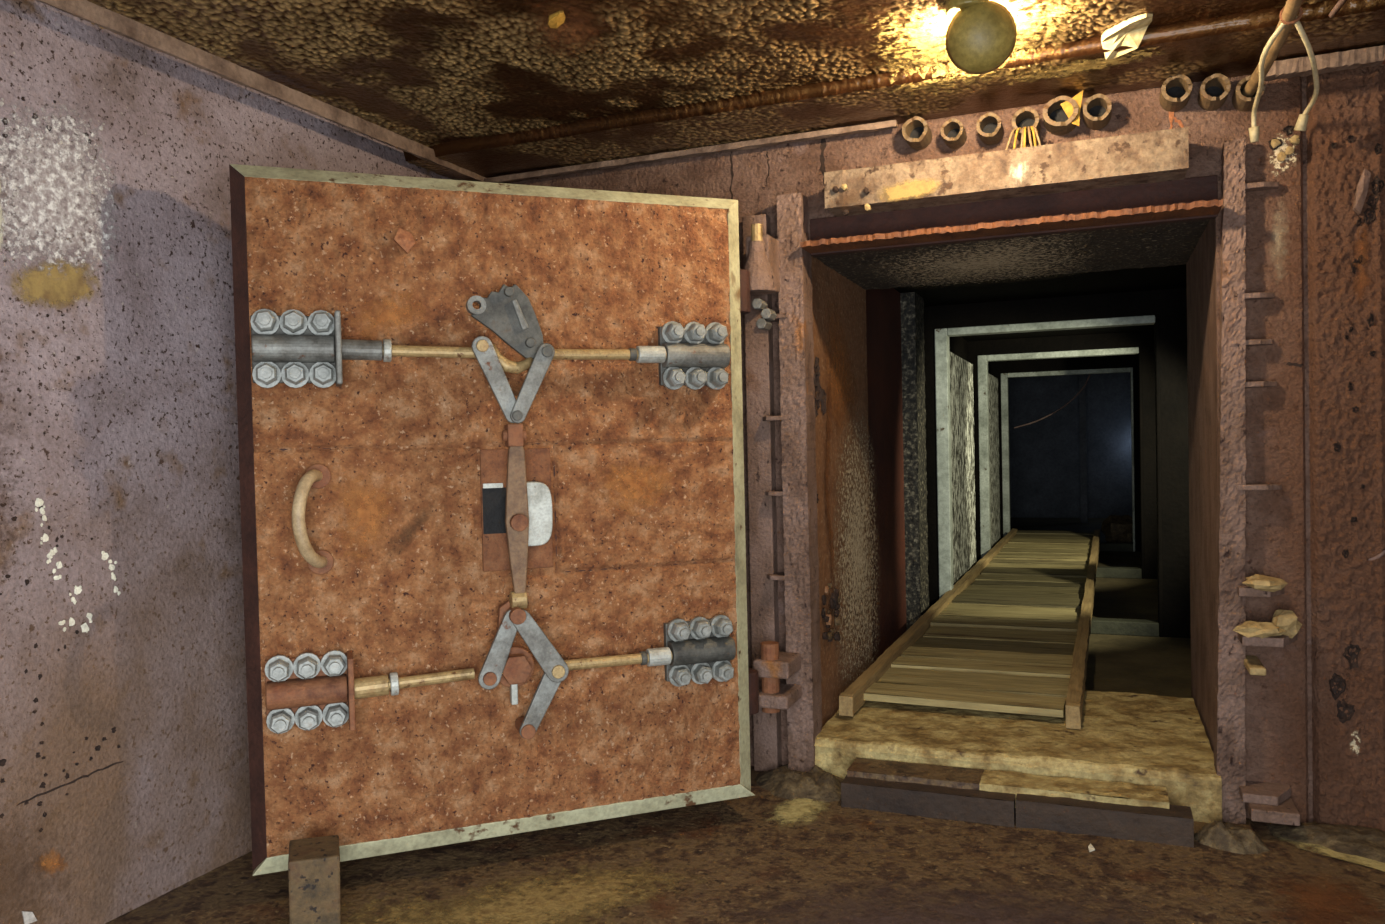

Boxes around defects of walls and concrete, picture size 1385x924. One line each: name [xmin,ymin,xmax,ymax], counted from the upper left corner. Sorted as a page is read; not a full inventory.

peeling [0,96,116,272]
rust [394,228,415,254]